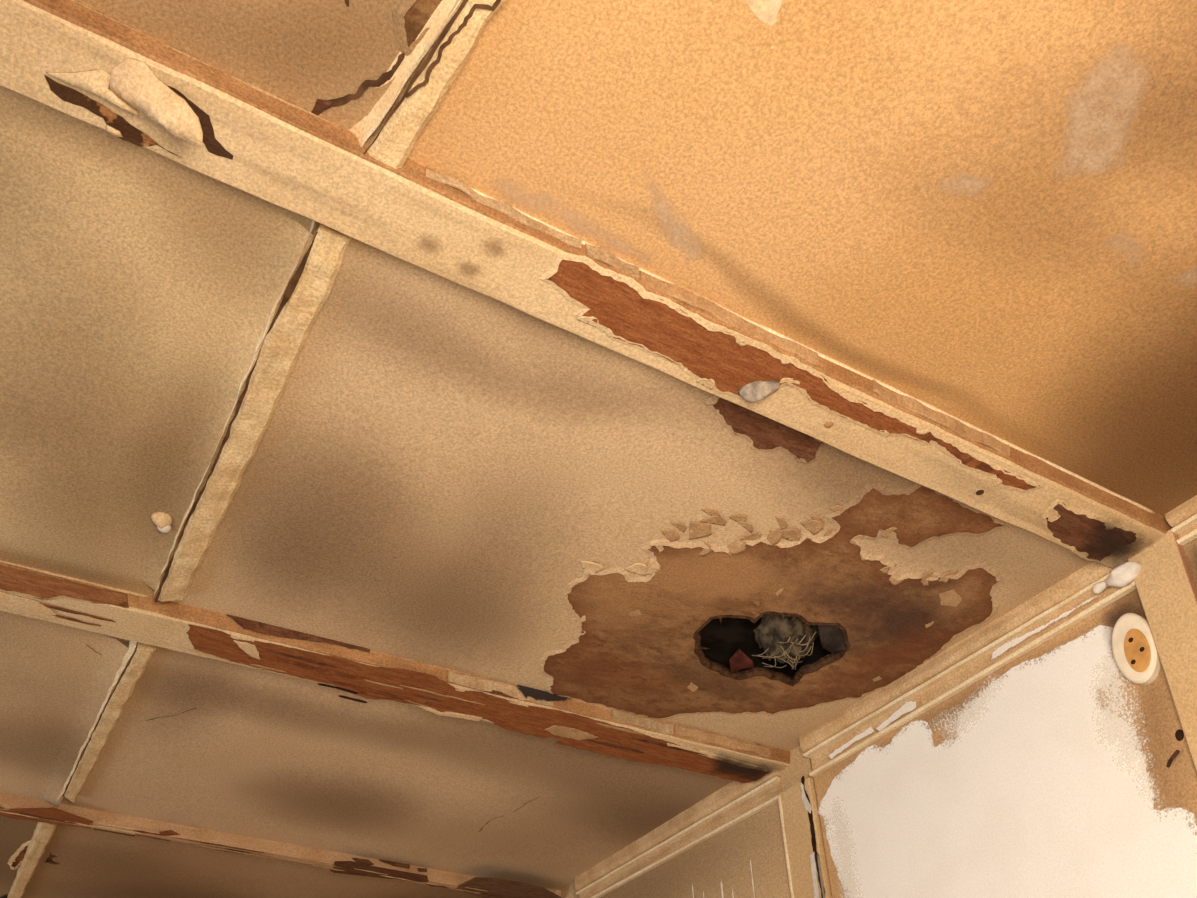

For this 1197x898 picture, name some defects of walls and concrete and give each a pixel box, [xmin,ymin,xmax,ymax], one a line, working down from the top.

peeling [392,0,442,56]
peeling [538,252,1044,493]
crack [154,231,318,602]
peeling [1041,499,1141,563]
peeling [182,482,1010,783]
peeling [0,807,138,837]
peeling [7,840,31,870]
peeling [330,857,429,883]
peeling [453,877,562,898]